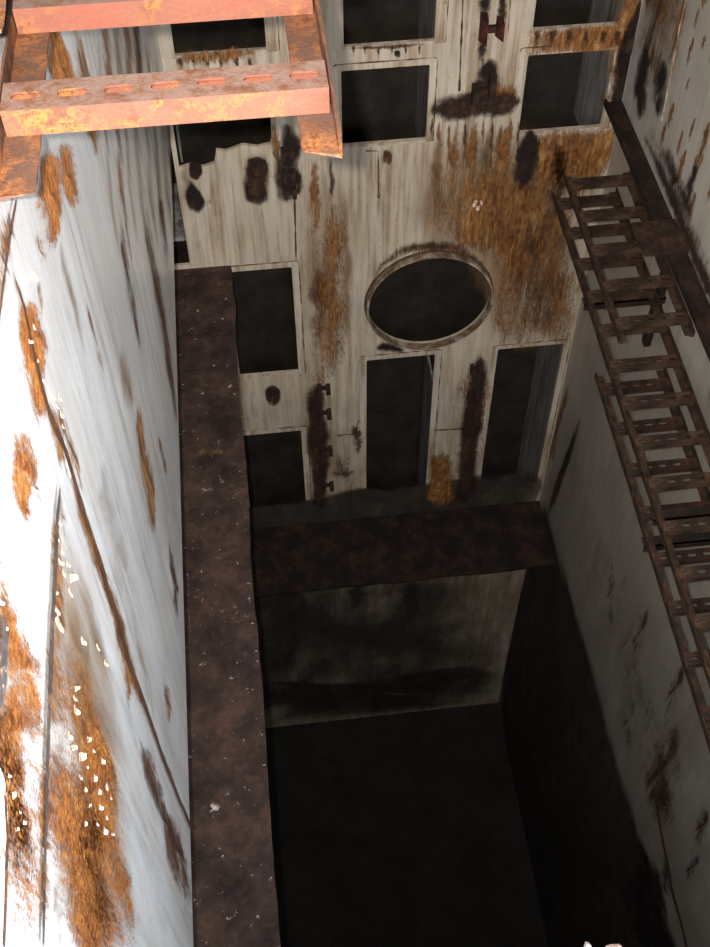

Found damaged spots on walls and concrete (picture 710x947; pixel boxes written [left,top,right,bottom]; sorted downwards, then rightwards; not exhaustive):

corrosion [36,144,79,258]
corrosion [47,30,91,79]
water stain [244,125,302,201]
water stain [430,44,539,189]
corrosion [378,128,615,343]
corrosion [529,0,673,101]
corrosion [649,103,710,298]
corrosion [11,433,41,525]
water stain [249,359,541,529]
water stain [254,579,487,716]
water stain [501,392,675,947]
corrosion [0,578,135,947]